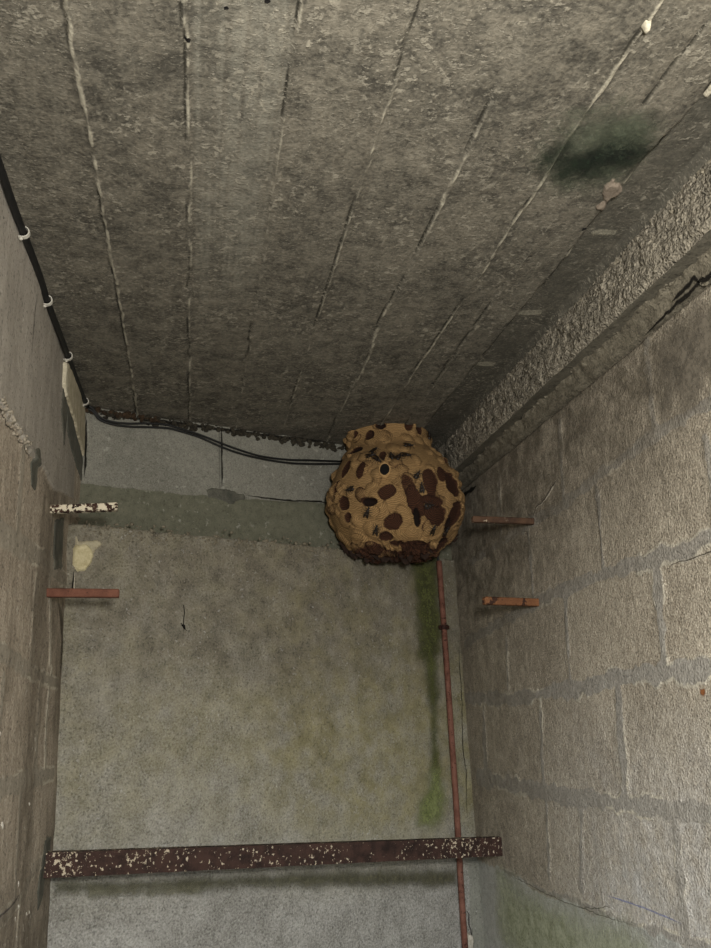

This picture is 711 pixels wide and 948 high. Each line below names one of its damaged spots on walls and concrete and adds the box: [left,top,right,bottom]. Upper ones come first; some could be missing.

water stain [545,121,650,182]
crack [0,395,33,457]
water stain [419,651,443,824]